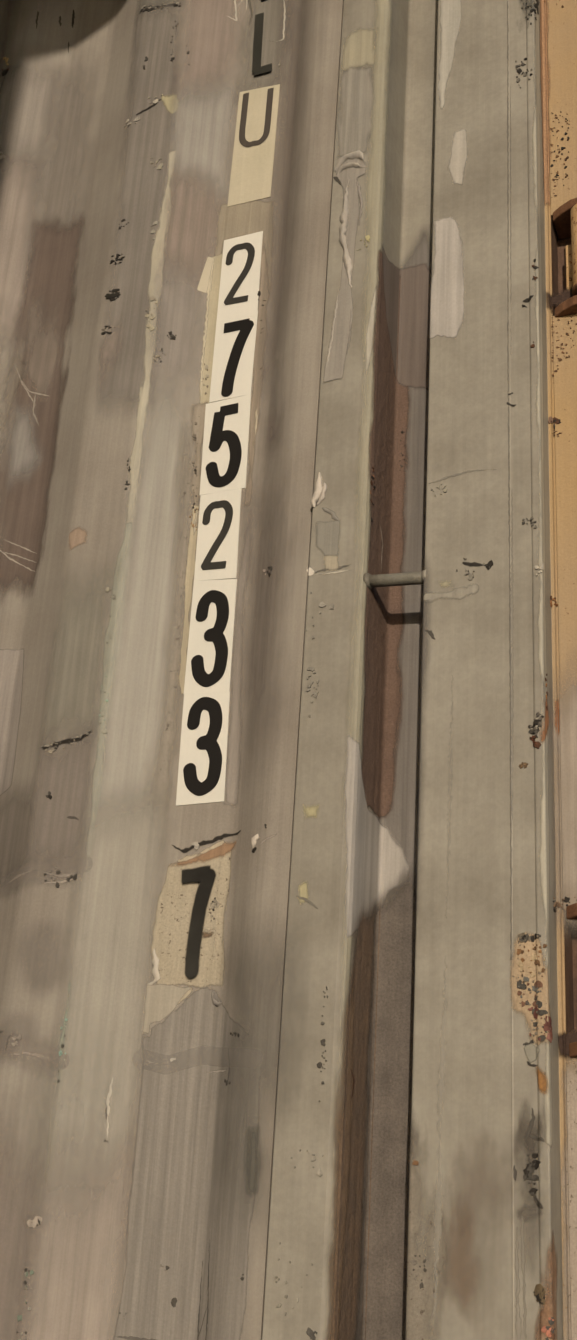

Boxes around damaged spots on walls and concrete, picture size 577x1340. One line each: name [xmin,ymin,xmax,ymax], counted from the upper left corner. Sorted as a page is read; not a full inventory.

corrosion [534,1237,557,1340]